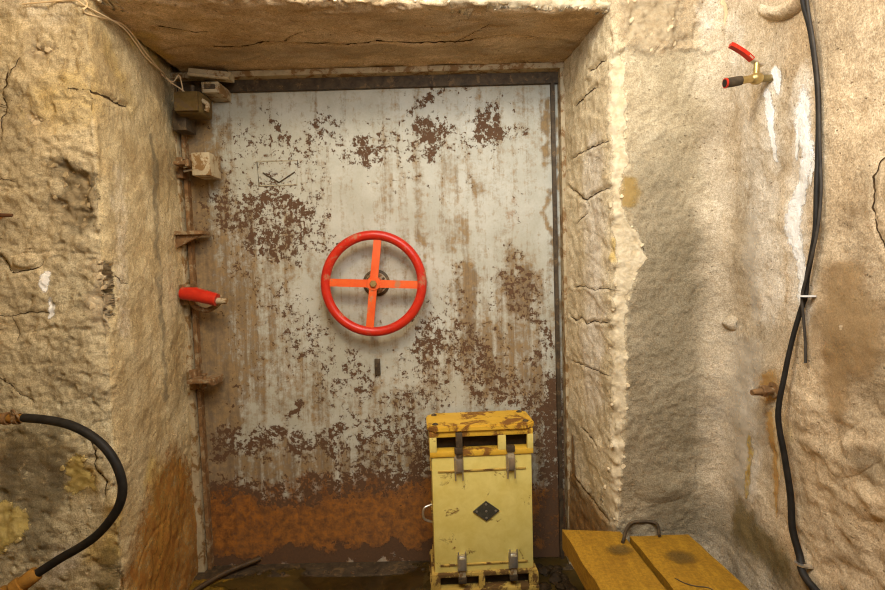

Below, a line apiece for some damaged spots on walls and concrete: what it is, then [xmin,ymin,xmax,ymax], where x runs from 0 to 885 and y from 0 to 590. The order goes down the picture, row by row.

spalling [447,0,684,57]
water stain [763,66,782,162]
water stain [784,84,815,302]
crack [872,157,885,247]
flaking render [600,43,648,522]
corrosion [760,371,779,513]
corrosion [122,446,198,590]